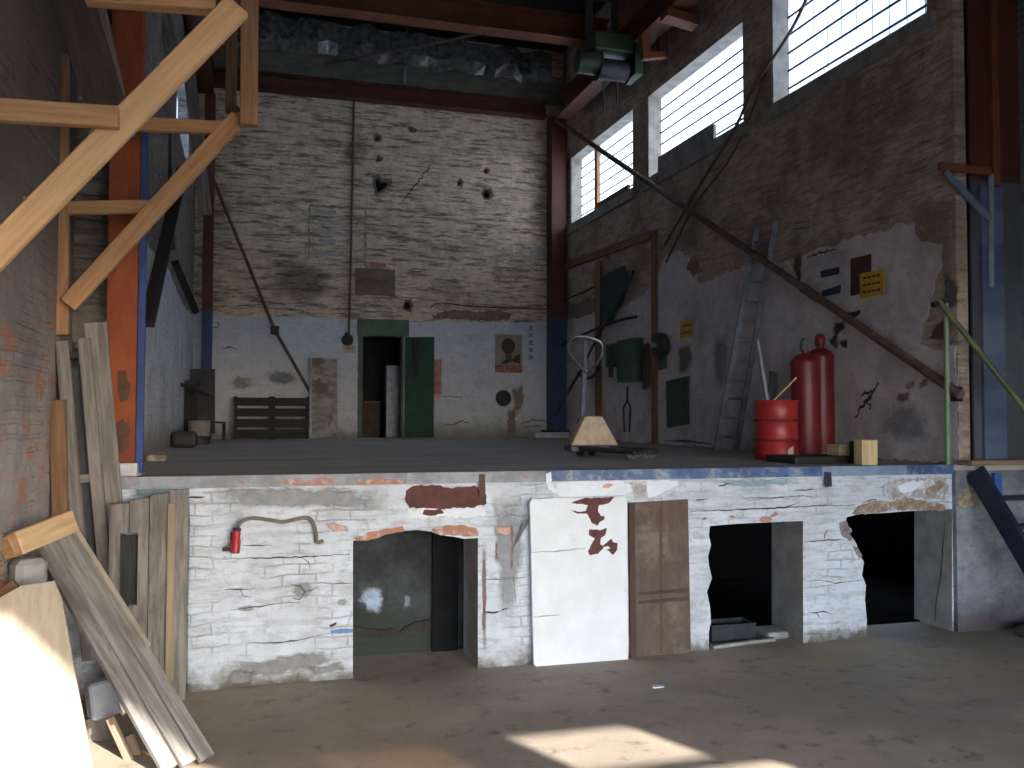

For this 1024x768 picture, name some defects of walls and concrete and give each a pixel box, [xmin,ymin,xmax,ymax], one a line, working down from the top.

spalling [372,155,392,195]
crack [399,160,434,204]
peeling [944,276,958,308]
peeling [930,320,944,339]
crack [854,383,879,418]
spalling [354,526,404,541]
peeling [405,485,487,537]
flaking render [839,477,978,558]
crack [224,545,350,610]
crack [252,633,330,644]
water stain [229,653,342,684]